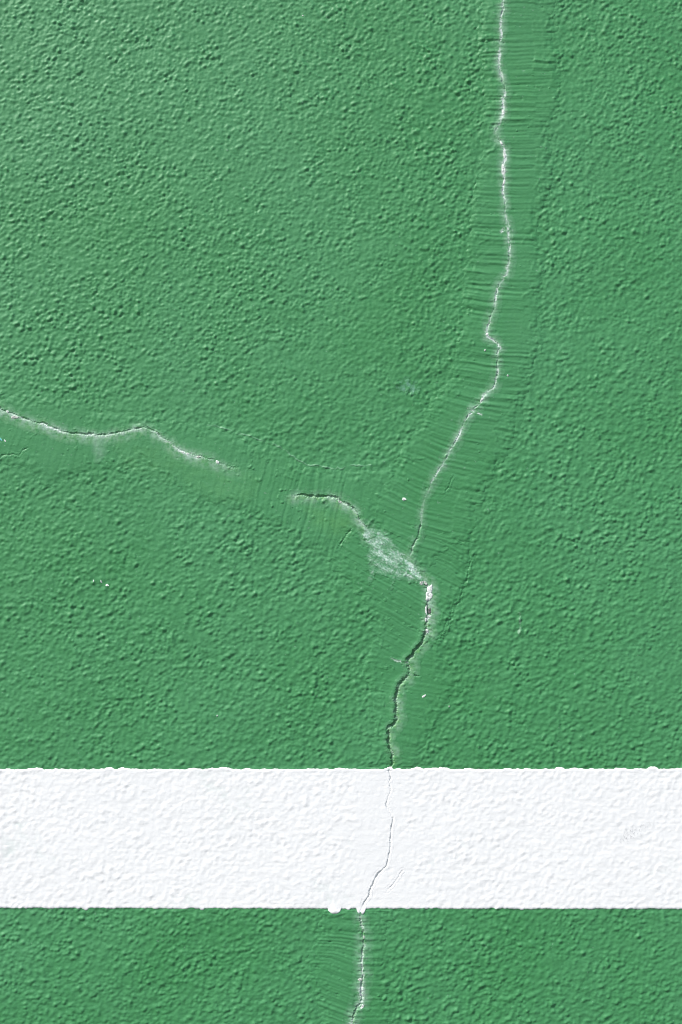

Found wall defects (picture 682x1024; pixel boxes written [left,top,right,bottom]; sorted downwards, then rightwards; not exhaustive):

crack [0,401,241,478]
crack [283,486,376,532]
crack [341,0,518,1024]